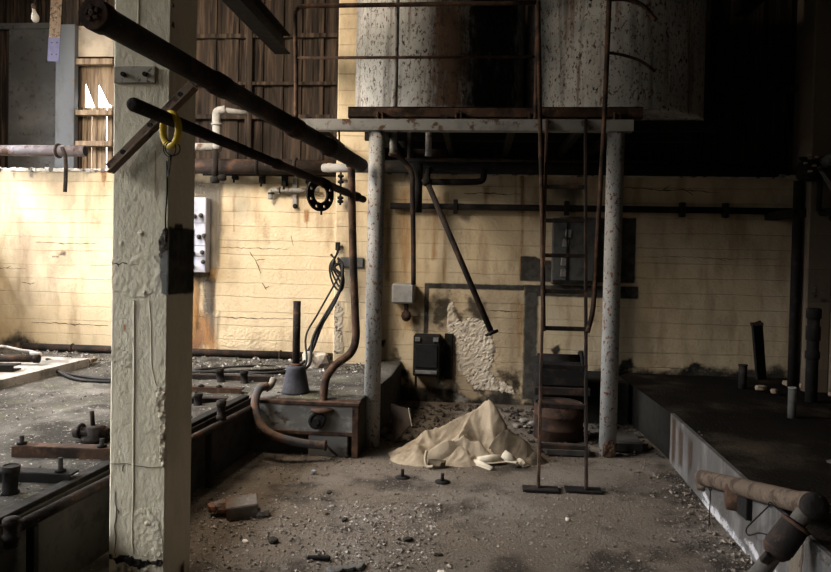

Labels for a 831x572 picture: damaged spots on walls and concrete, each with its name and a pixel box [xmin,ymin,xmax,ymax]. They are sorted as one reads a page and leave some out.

rust [192,281,218,349]
flaking render [447,301,517,394]
peeling [109,508,163,572]